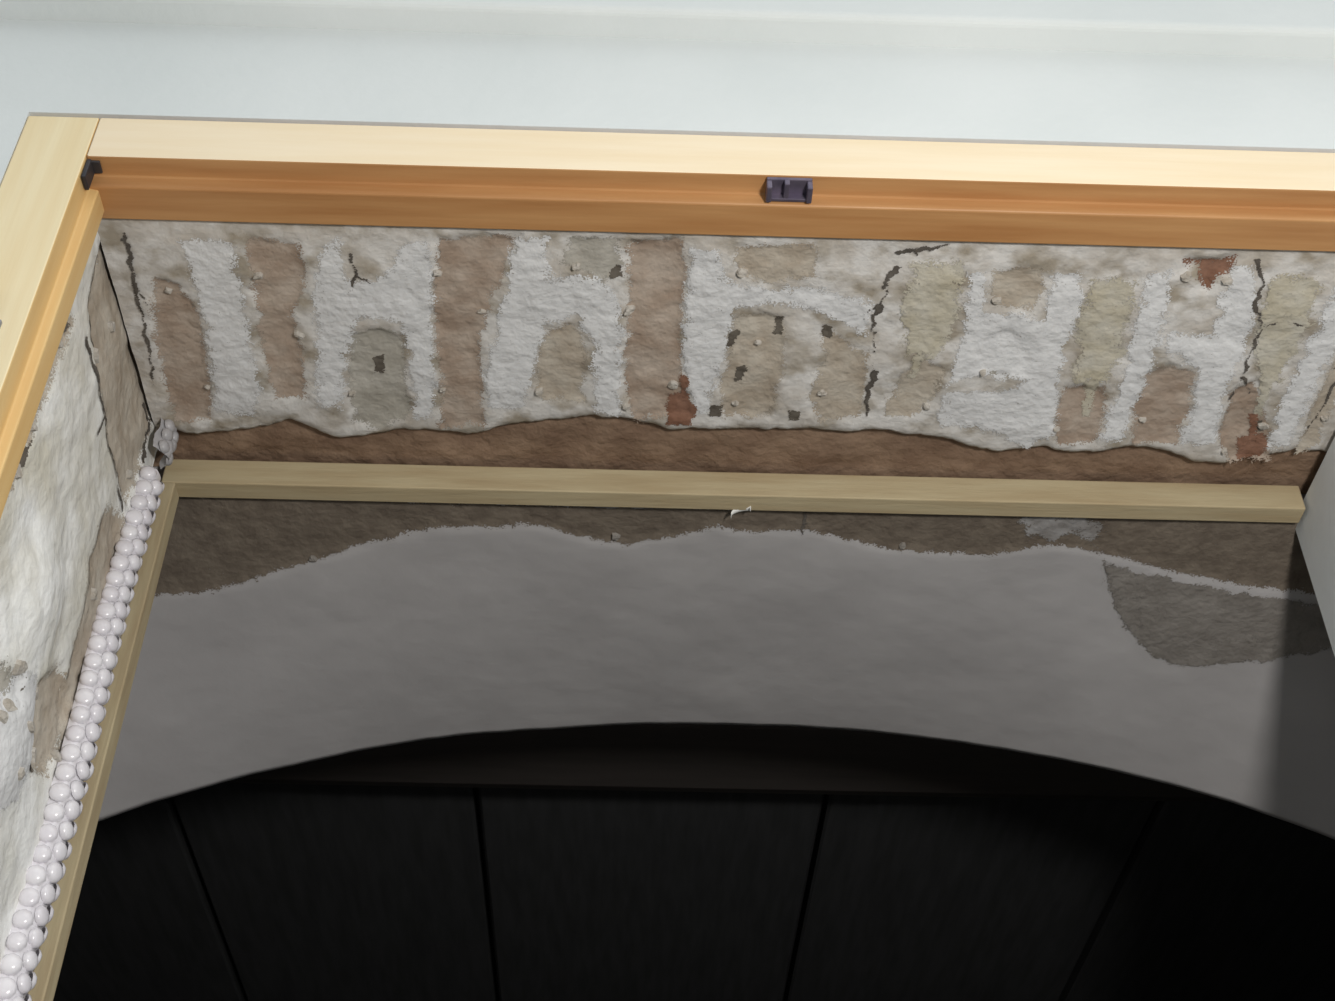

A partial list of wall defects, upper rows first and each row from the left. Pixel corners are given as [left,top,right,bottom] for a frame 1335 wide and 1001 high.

crack [86,232,155,512]
spalling [146,277,214,426]
spalling [240,236,312,400]
spalling [431,233,516,429]
spalling [559,236,692,423]
spalling [709,312,871,424]
crack [864,244,948,416]
spalling [1129,364,1196,445]
spalling [1180,254,1238,290]
crack [1228,258,1303,400]
spalling [0,242,151,780]
spalling [155,497,1315,598]